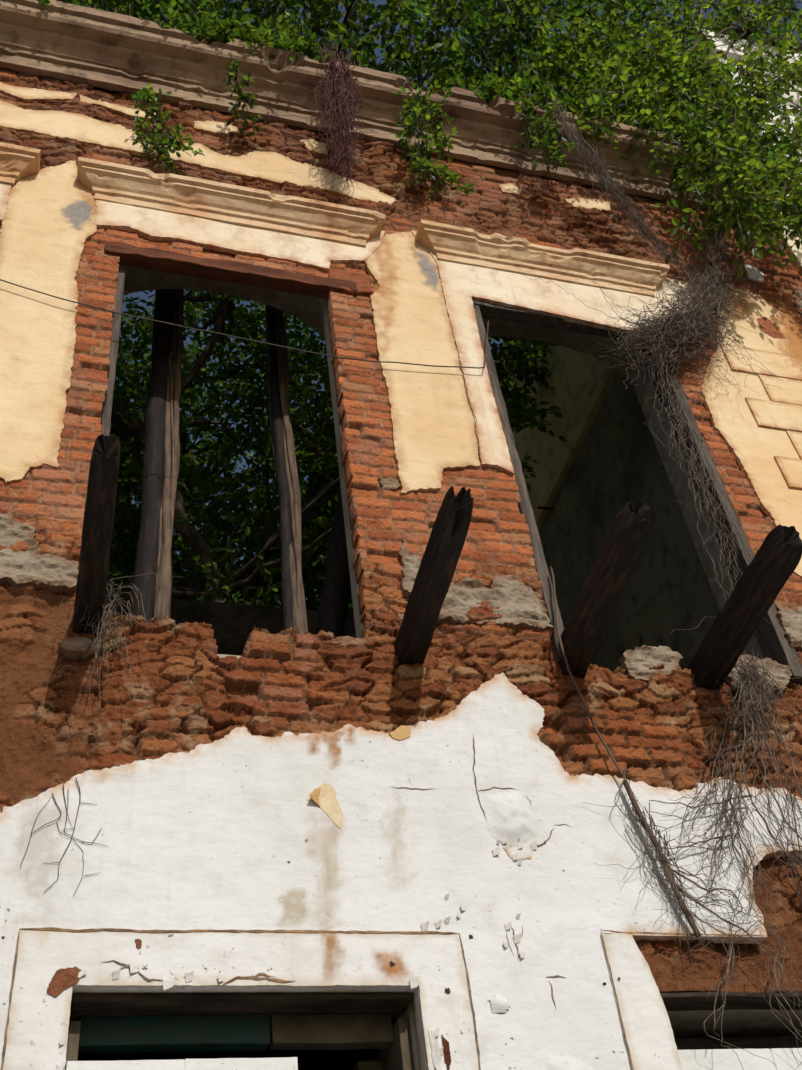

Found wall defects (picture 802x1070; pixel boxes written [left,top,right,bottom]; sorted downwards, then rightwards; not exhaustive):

spalling [0,67,802,556]
spalling [0,228,802,813]
peeling [307,783,344,829]
crack [473,733,531,819]
peeling [492,836,537,865]
spalling [47,967,87,996]
peeling [162,970,194,990]
crack [1,927,481,1070]
rust [377,954,404,975]
spalling [635,856,802,993]